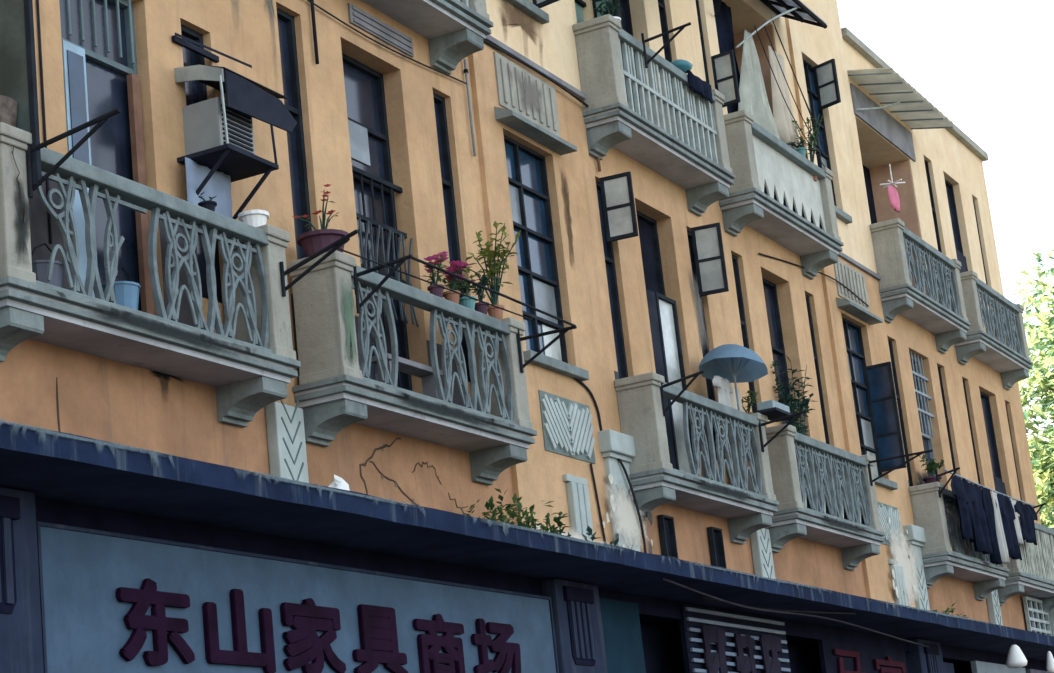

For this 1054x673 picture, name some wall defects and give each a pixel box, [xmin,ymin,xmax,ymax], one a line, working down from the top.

water stain [0,420,157,459]
crack [360,438,465,515]